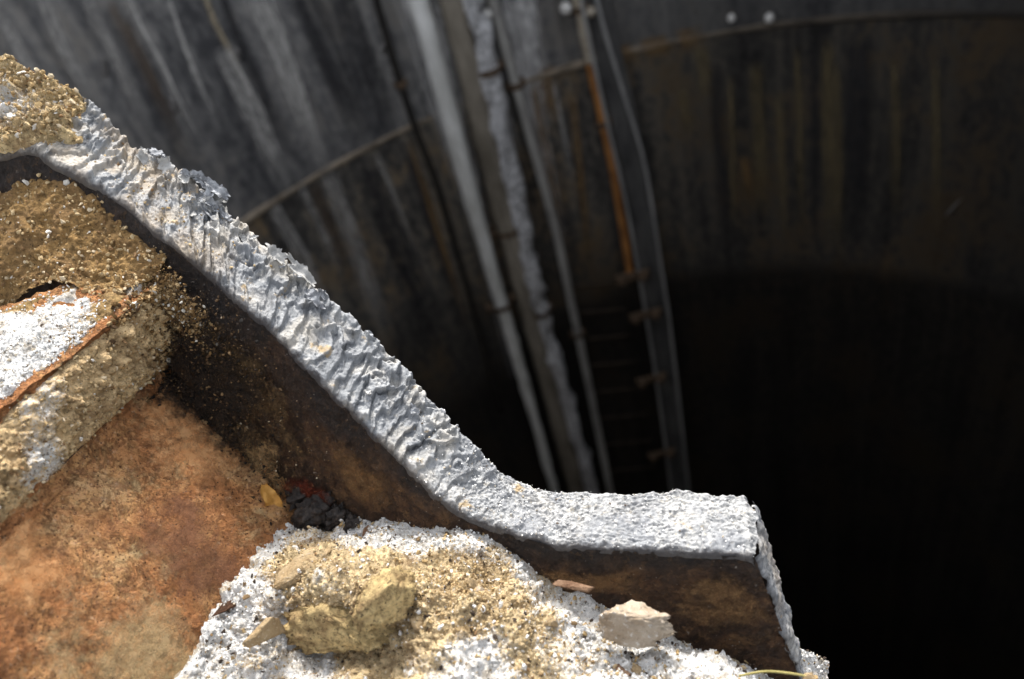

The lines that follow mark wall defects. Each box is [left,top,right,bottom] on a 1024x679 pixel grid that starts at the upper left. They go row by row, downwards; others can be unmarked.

corrosion [145,400,222,472]
corrosion [0,522,58,605]
corrosion [144,493,240,592]